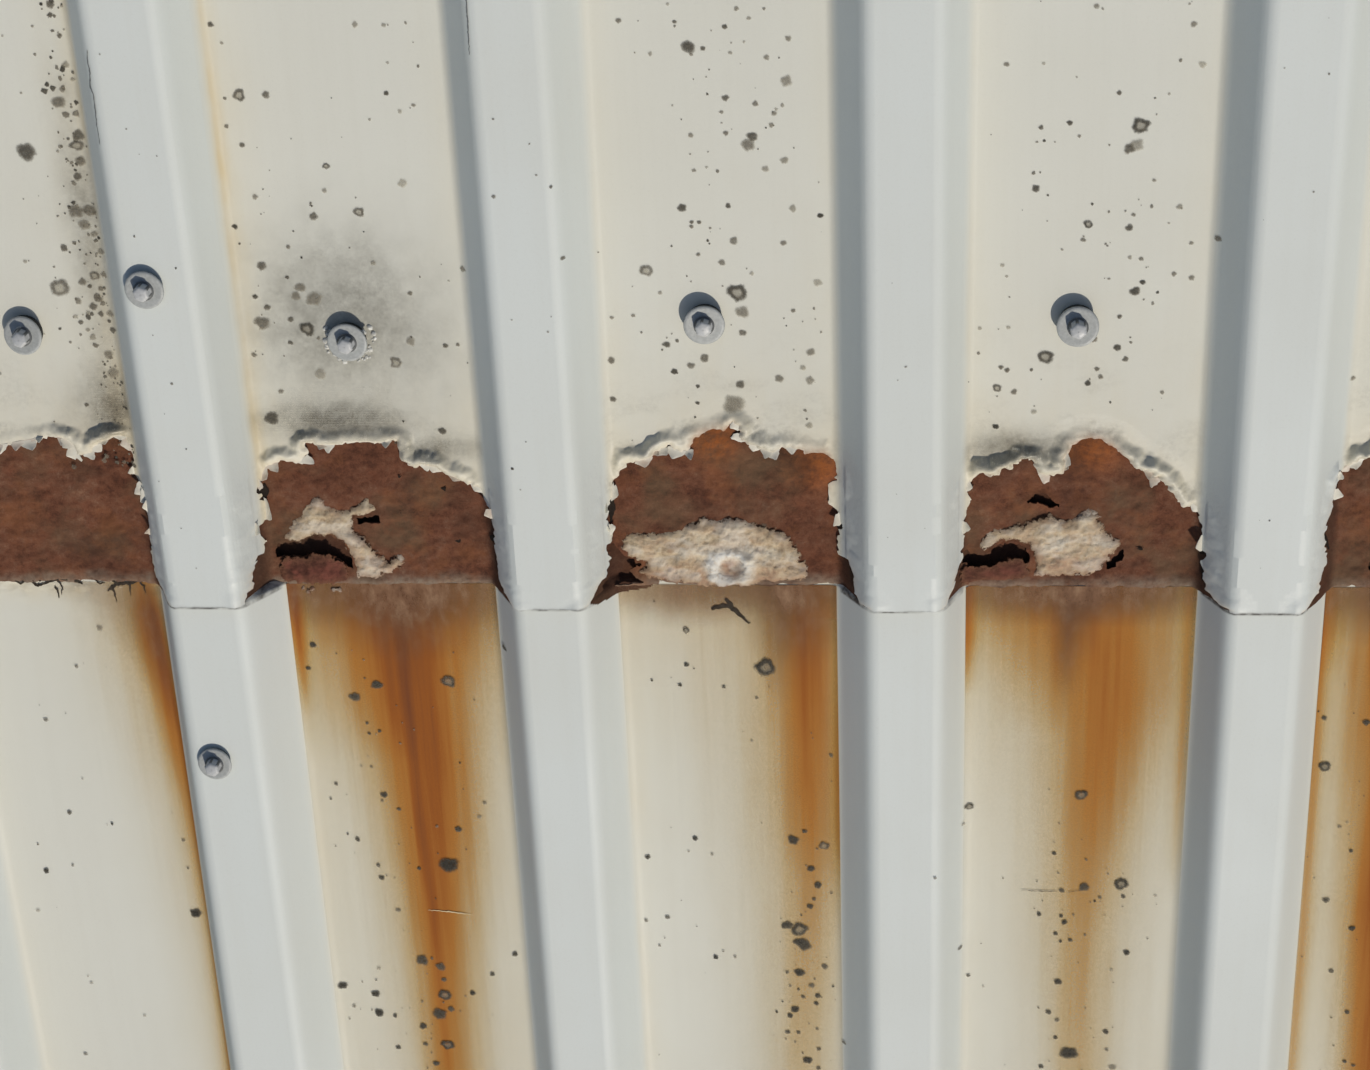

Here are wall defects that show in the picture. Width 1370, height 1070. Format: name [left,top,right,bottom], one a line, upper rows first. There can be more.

corrosion [0,410,230,1070]
corrosion [215,413,539,1070]
corrosion [558,395,894,1001]
corrosion [915,413,1257,1056]
corrosion [1278,424,1370,1070]